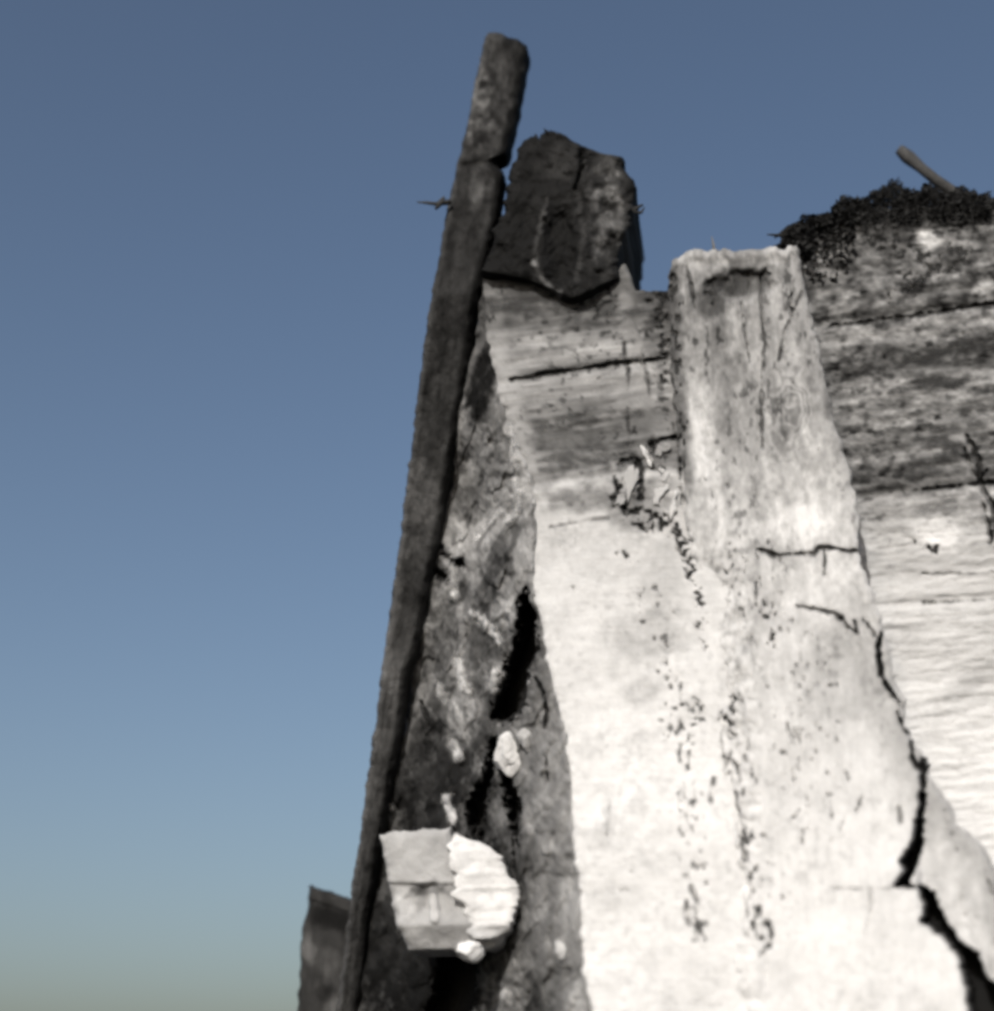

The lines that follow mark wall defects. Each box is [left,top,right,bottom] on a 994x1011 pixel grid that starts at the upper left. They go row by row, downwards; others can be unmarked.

crack [510,343,653,387]
spalling [610,413,705,606]
crack [916,435,994,544]
crack [759,545,857,568]
crack [534,676,548,708]
spalling [659,697,705,771]
crack [796,605,994,1011]